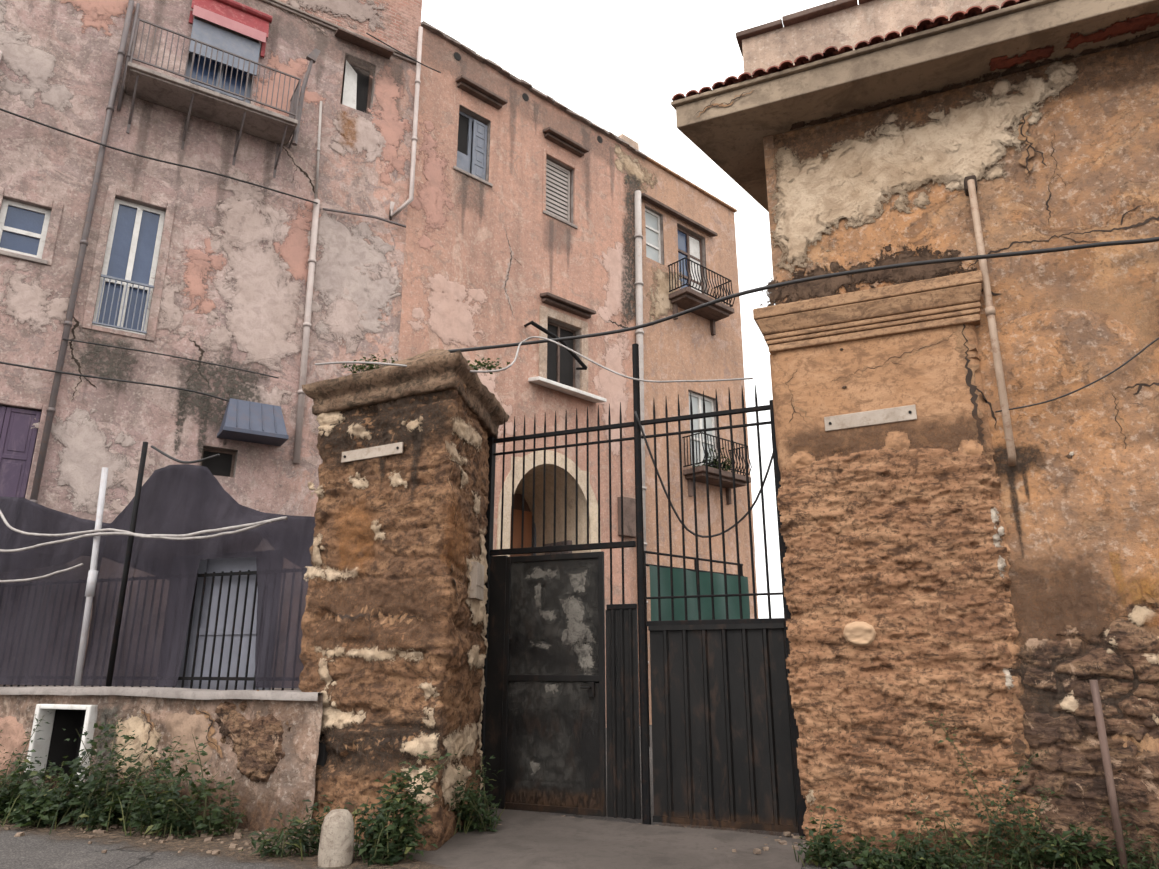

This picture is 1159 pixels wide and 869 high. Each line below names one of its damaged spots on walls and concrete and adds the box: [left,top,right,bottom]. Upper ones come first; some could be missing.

peeling [57,0,136,37]
crack [283,4,329,36]
peeling [246,50,458,251]
peeling [757,61,1078,307]
crack [961,111,1159,296]
peeling [147,170,488,415]
crack [53,316,97,402]
mould [175,352,264,456]
crack [831,324,997,465]
crack [1112,378,1159,449]
flaking render [108,700,291,787]